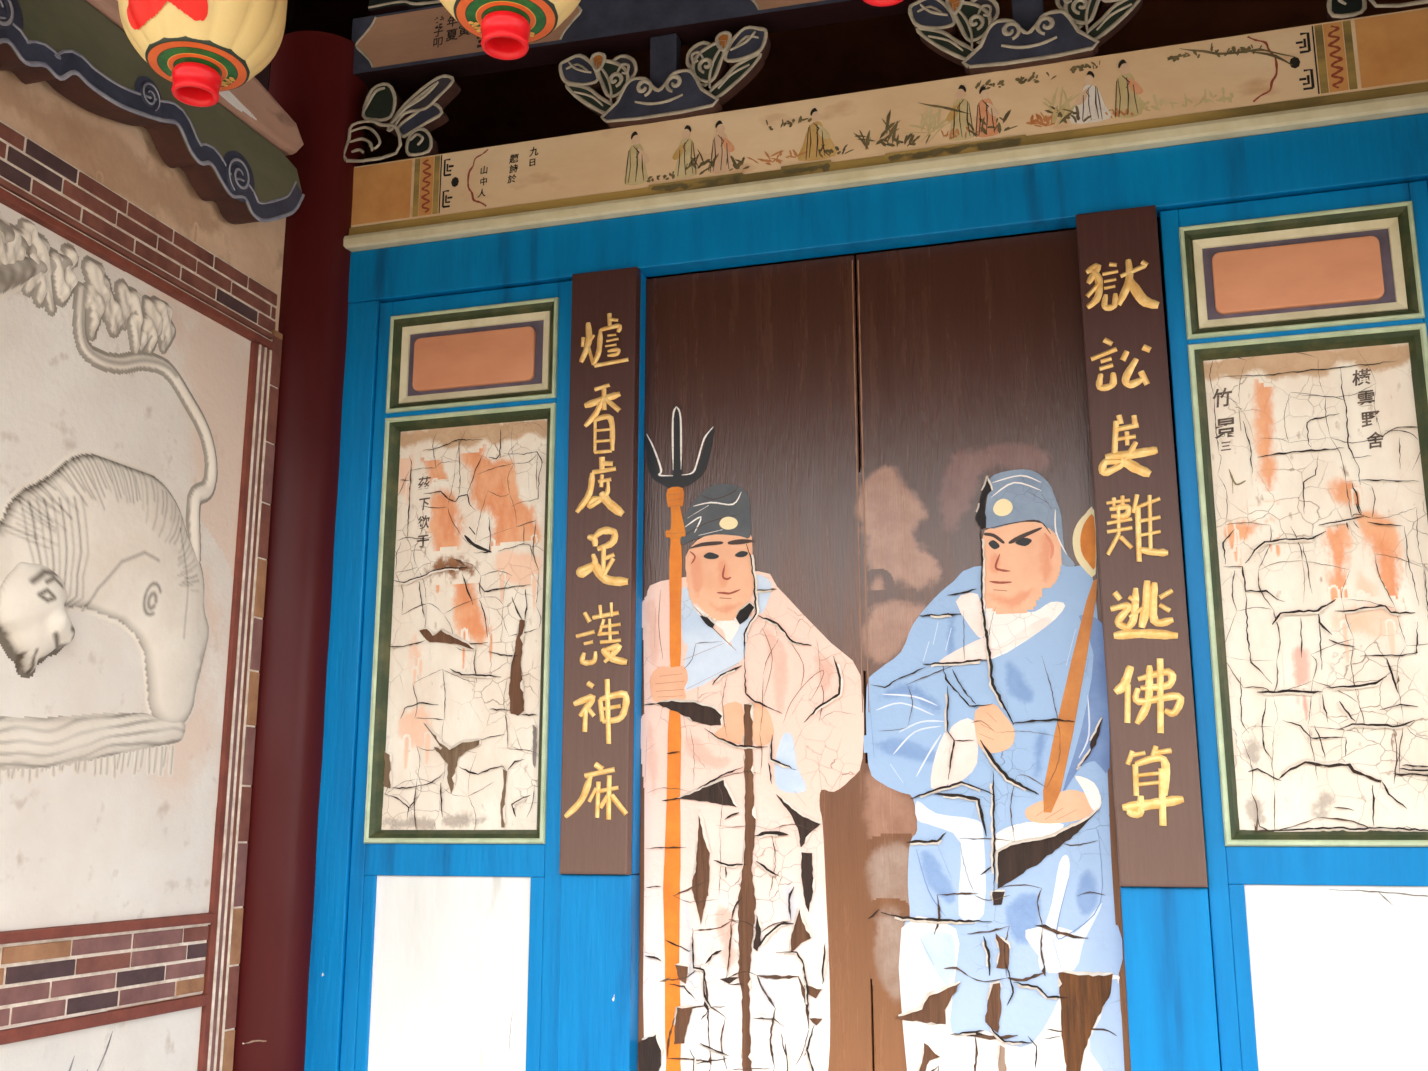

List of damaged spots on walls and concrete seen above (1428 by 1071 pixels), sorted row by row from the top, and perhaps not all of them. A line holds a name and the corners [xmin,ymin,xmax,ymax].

crack [384,422,542,831]
peeling [390,583,537,828]
crack [1209,351,1428,832]